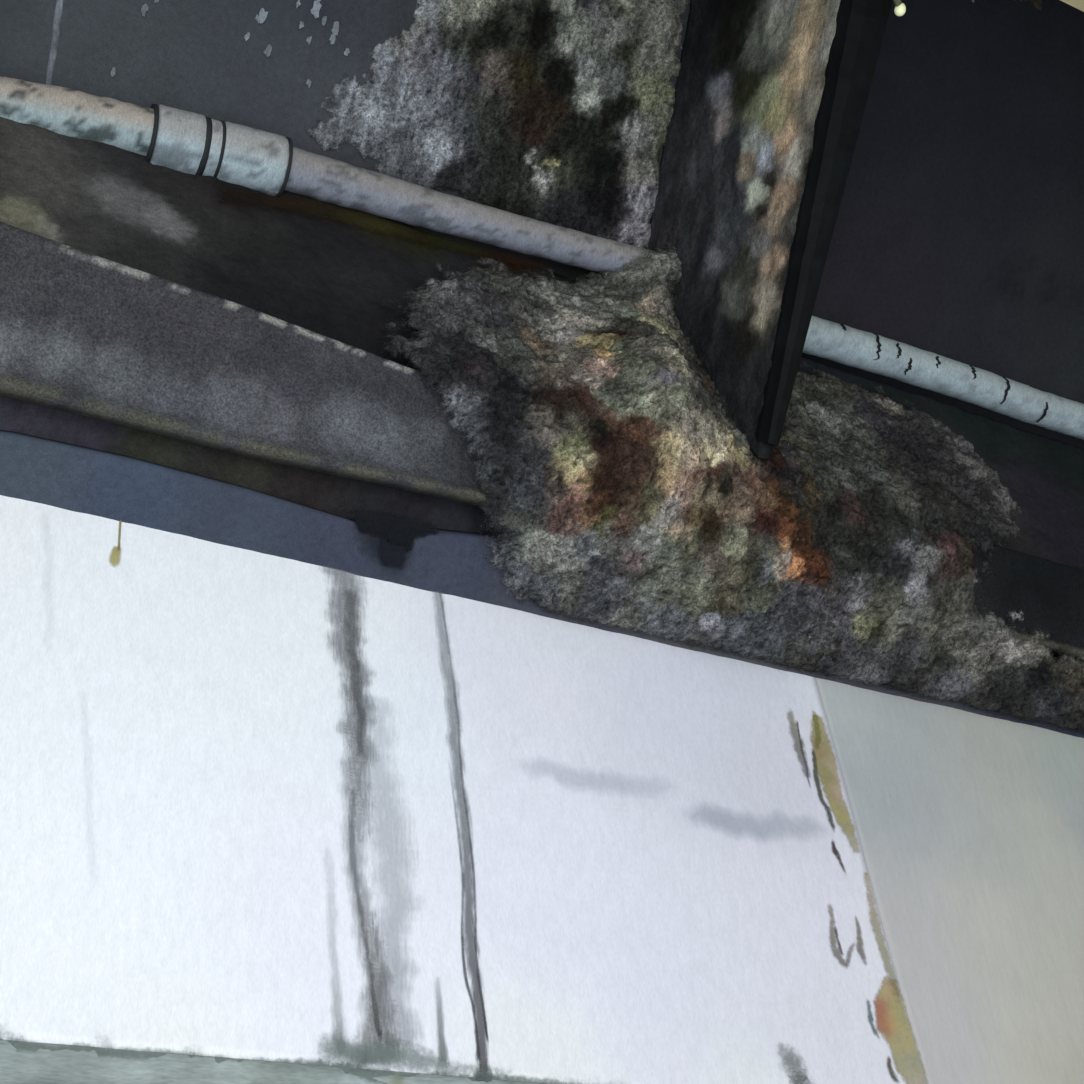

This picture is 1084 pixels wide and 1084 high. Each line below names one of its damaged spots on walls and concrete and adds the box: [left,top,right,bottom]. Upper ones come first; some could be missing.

damp [46,0,63,85]
damp [307,0,688,248]
crack [840,323,941,375]
crack [1000,376,1011,404]
crack [1037,402,1048,423]
rust [385,239,1084,732]
damp [352,509,439,569]
damp [328,567,369,785]
peeling [789,713,835,829]
damp [257,610,556,1084]
peeling [829,906,866,966]
damp [9,1042,175,1057]